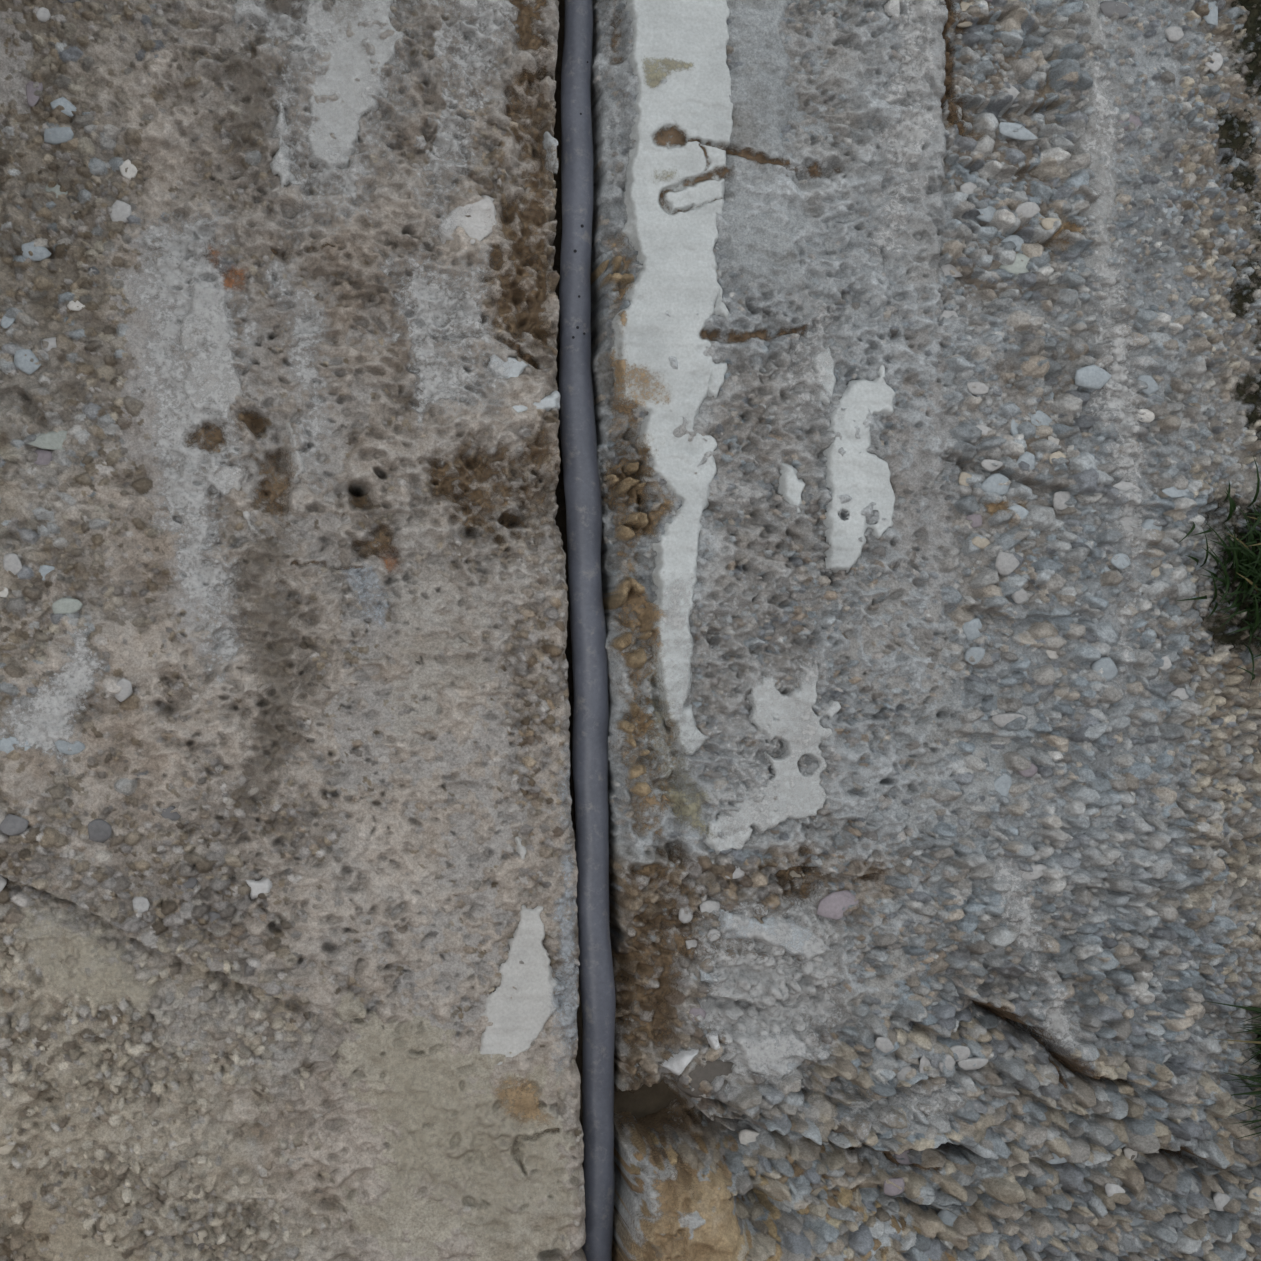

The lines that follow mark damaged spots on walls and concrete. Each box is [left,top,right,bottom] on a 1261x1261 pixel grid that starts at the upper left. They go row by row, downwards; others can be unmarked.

leakage [228,0,526,236]
leakage [643,58,692,88]
crack [941,0,965,137]
leakage [381,245,514,422]
leakage [647,577,846,846]
crack [972,1000,1127,1088]